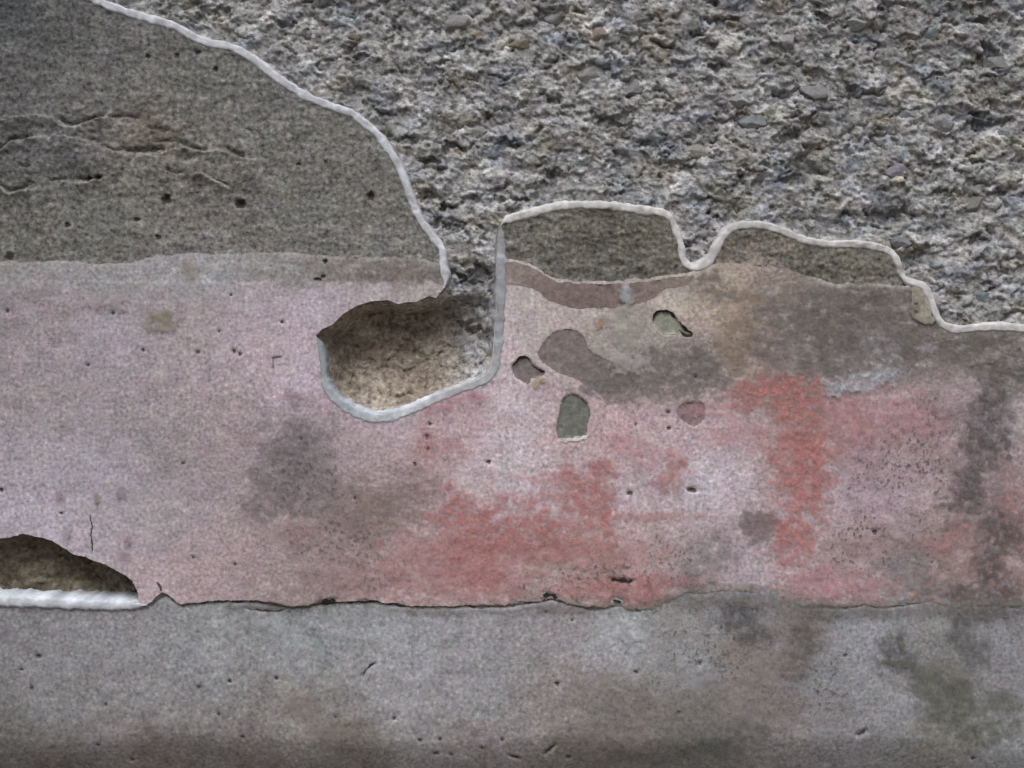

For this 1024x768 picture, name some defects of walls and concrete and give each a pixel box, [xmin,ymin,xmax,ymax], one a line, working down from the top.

crack [0,118,96,191]
crack [58,115,260,174]
spalling [106,0,1024,337]
flaking render [512,329,634,443]
leakage [744,286,1024,666]
crack [153,582,640,612]